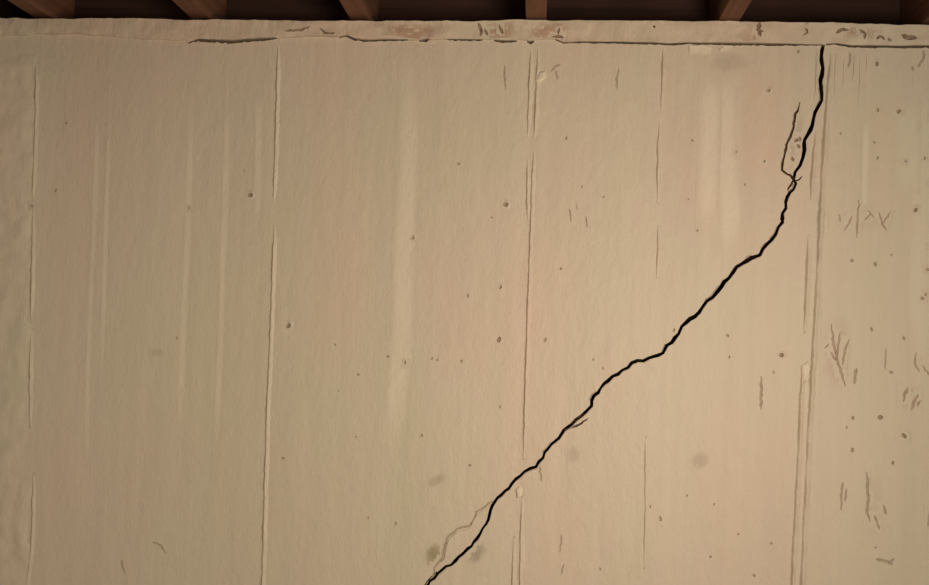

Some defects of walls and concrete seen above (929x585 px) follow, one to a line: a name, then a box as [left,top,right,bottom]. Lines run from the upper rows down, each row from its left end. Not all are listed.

crack [188,37,273,45]
crack [591,40,709,48]
crack [424,44,929,585]